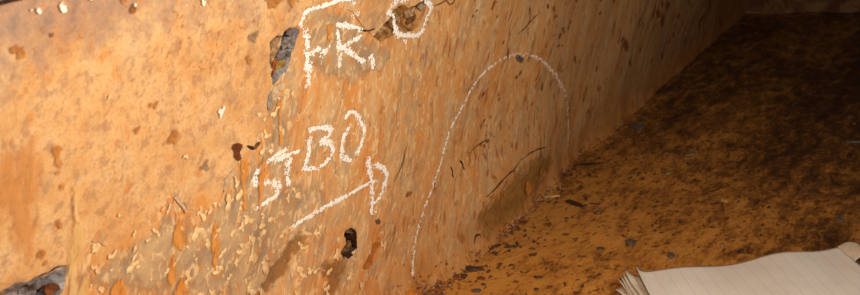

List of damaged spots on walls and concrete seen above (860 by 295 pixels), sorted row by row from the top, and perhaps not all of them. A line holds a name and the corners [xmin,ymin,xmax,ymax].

peeling [270,0,429,85]
rust [0,0,424,295]
peeling [76,91,325,295]
spalling [0,266,66,295]
rust [453,273,486,293]